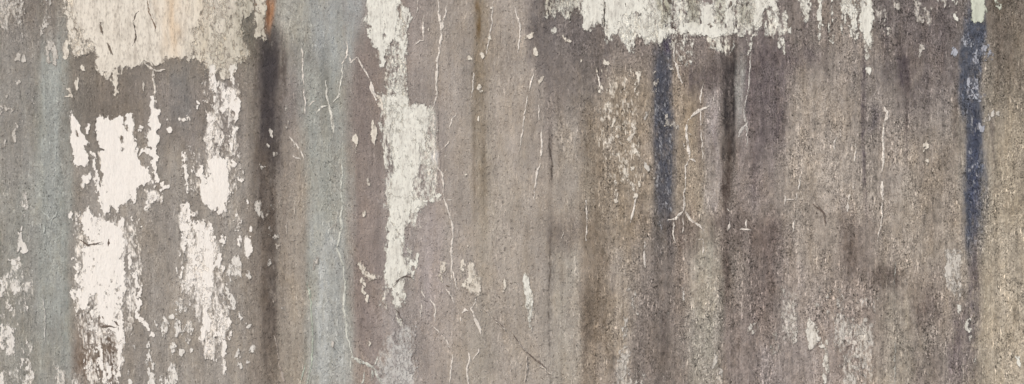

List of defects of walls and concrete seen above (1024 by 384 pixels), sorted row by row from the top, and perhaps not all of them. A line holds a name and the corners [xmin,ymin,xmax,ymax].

peeling [0,0,25,38]
peeling [40,0,279,384]
water stain [242,0,368,384]
crack [301,43,383,384]
peeling [352,0,442,384]
water stain [521,0,835,384]
peeling [544,0,1002,235]
water stain [835,0,1024,384]